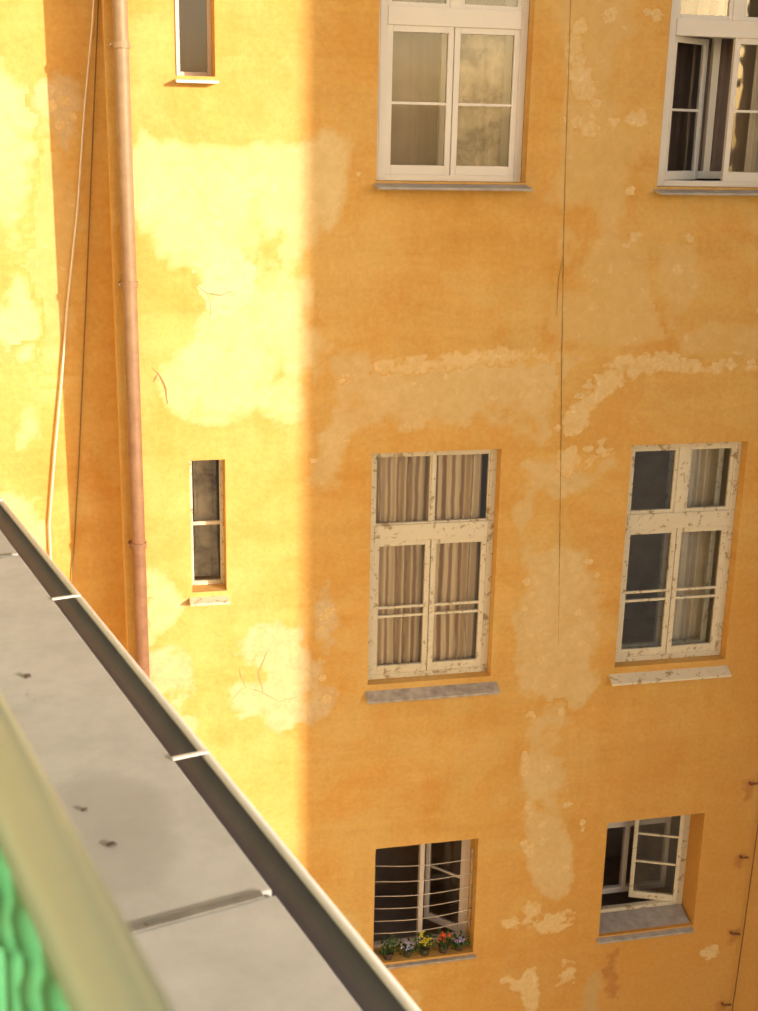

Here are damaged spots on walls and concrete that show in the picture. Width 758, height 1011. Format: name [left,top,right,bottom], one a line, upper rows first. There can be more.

peeling [559,15,649,138]
flaking render [0,54,88,454]
crack [151,367,168,404]
flaking render [0,479,53,560]
flaking render [132,122,758,935]
leakage [49,770,203,909]
peeling [499,965,541,1011]
peeling [554,958,577,988]